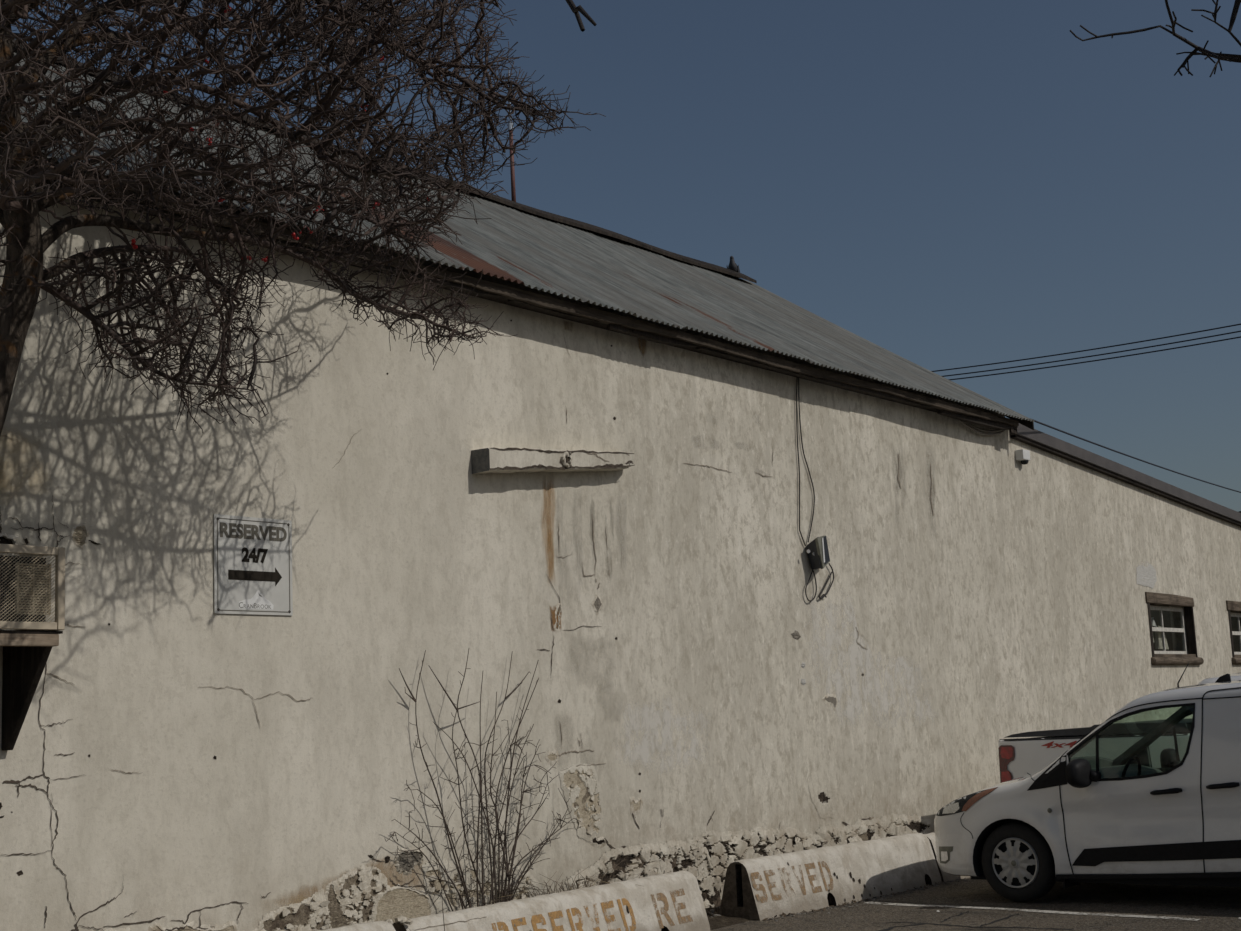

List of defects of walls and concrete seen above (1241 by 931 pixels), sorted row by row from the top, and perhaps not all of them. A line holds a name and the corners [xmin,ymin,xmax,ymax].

flaking render [0,532,30,545]
flaking render [70,523,100,549]
crack [208,686,311,725]
crack [3,663,271,931]
flaking render [559,763,932,908]
flaking render [147,847,540,931]